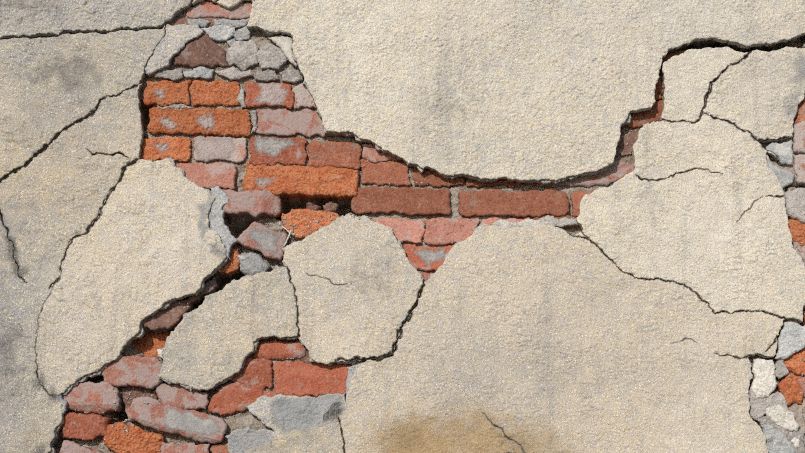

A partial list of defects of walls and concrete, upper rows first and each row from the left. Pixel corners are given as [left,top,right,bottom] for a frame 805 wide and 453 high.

crack [1,26,158,38]
spalling [145,24,204,77]
crack [0,84,138,183]
crack [635,168,723,182]
crack [651,34,805,168]
peeling [766,140,795,189]
spalling [199,186,238,261]
spalling [487,215,578,229]
crack [35,149,138,397]
crack [555,223,785,360]
peeling [225,363,361,453]
peeling [749,321,805,453]